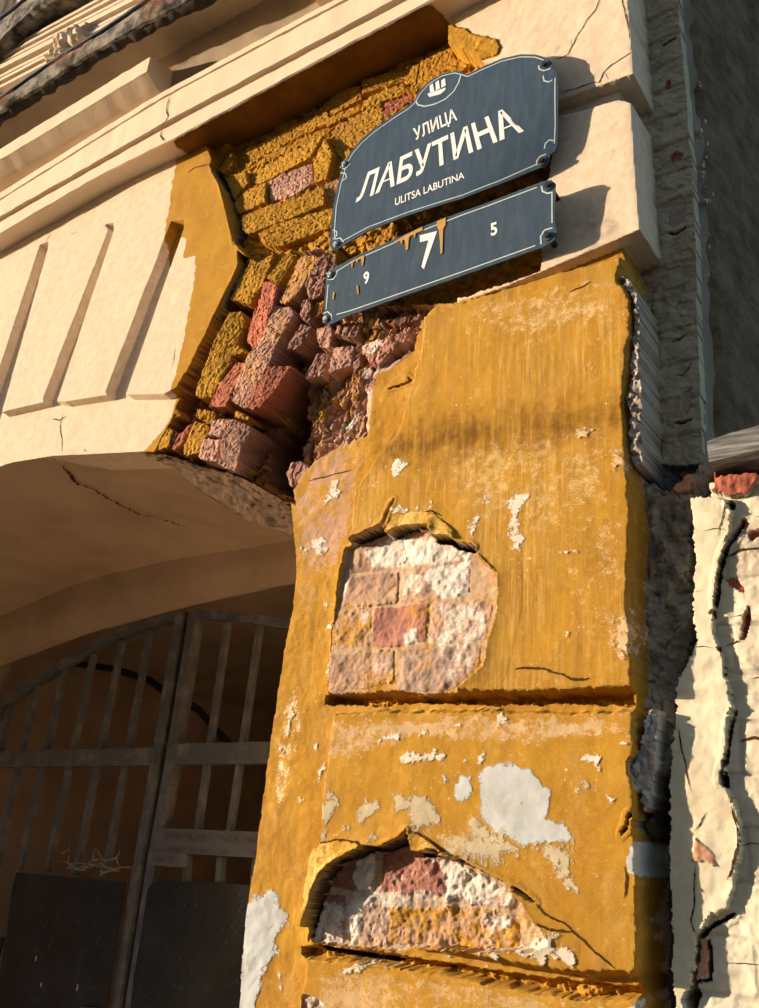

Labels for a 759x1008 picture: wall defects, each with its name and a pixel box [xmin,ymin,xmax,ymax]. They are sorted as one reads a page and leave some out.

crack [554,0,639,93]
spalling [145,30,552,535]
spalling [324,495,498,700]
crack [695,500,759,648]
crack [516,666,589,681]
peeling [400,748,445,764]
crack [720,709,759,780]
peeling [239,889,288,1008]
spalling [315,752,579,974]
crack [306,830,615,969]
crack [690,871,759,982]
crack [727,807,758,879]